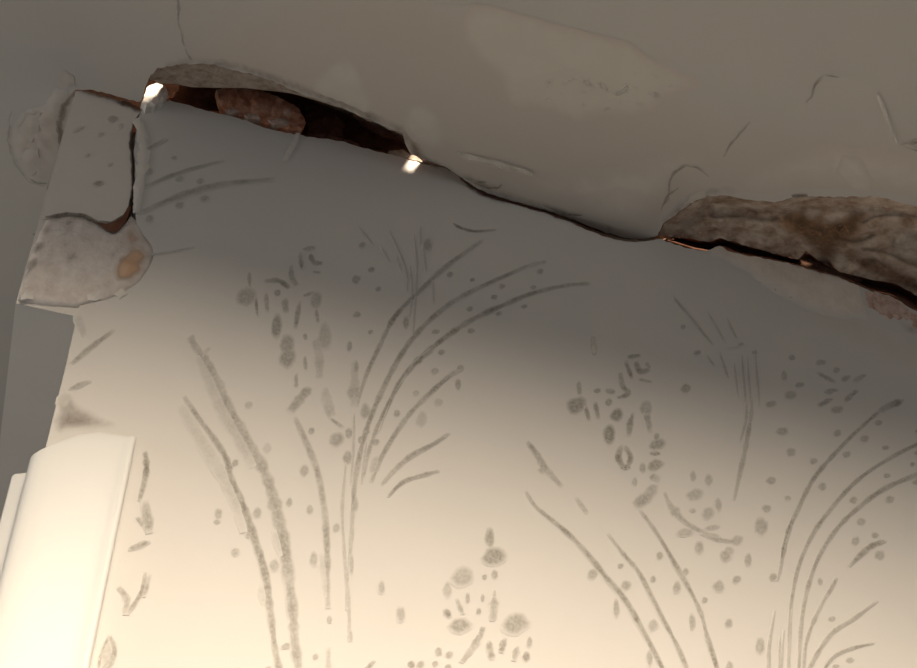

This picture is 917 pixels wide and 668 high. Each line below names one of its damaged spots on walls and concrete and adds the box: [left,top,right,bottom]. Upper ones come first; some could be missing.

spalling [10,71,153,308]
spalling [149,53,447,149]
crack [418,157,666,242]
spalling [525,140,917,329]